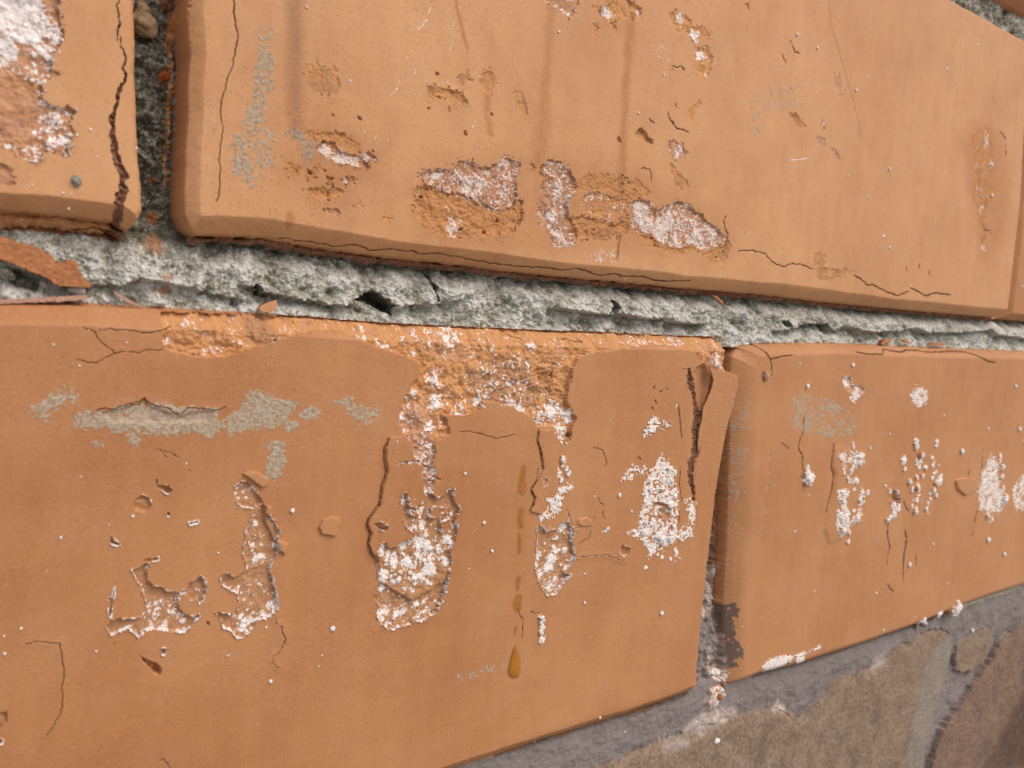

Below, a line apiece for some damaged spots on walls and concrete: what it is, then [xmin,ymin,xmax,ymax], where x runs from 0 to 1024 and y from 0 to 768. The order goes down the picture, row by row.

crack [71,0,130,242]
crack [216,0,239,201]
spalling [410,139,733,265]
spalling [971,126,994,254]
spalling [105,471,288,645]
crack [366,438,421,558]
spalling [160,300,739,639]
efflorescence [620,452,697,570]
crack [678,368,702,521]
efflorescence [835,442,871,544]
efflorescence [886,437,943,523]
efflorescence [975,453,1024,524]